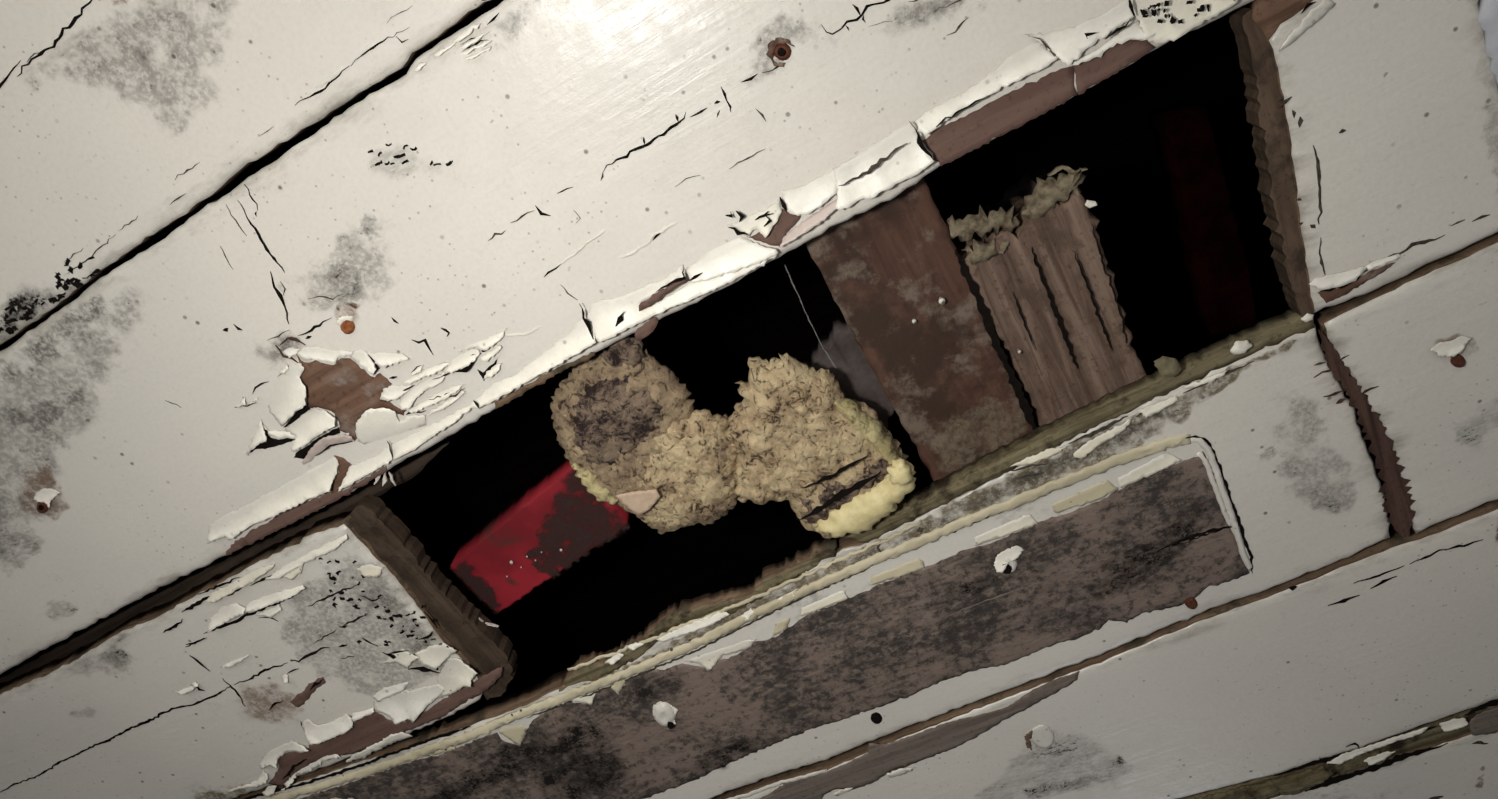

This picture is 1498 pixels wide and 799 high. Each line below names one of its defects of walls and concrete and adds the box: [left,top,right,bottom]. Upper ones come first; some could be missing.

crack [0,0,92,88]
crack [822,0,969,36]
crack [488,66,779,300]
leakage [0,257,102,340]
peeling [206,0,1238,556]
peeling [1230,340,1253,355]
peeling [1301,254,1405,323]
leakage [904,340,1296,541]
crack [1,585,383,792]
peeling [163,457,1249,799]
leakage [624,547,879,670]
leakage [1022,737,1078,798]